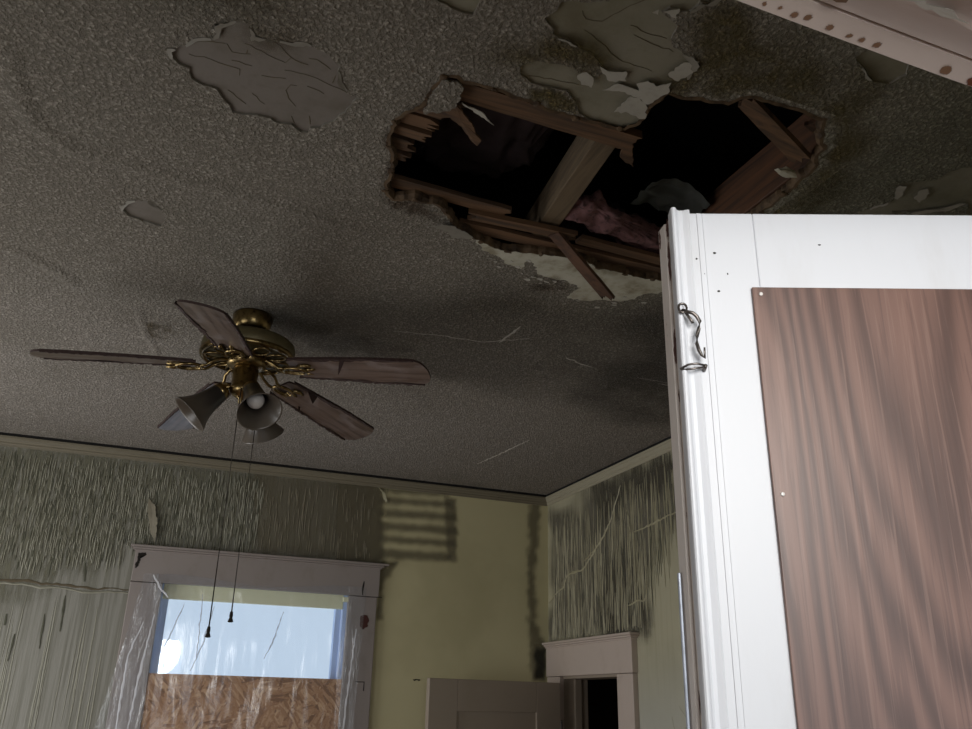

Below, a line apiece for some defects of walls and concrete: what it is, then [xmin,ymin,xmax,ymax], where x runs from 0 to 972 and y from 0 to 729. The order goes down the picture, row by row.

peeling [520,0,721,127]
peeling [856,167,972,215]
peeling [433,219,671,309]
crack [0,432,676,603]
crack [4,614,15,661]
crack [0,562,164,649]
peeling [0,449,374,729]